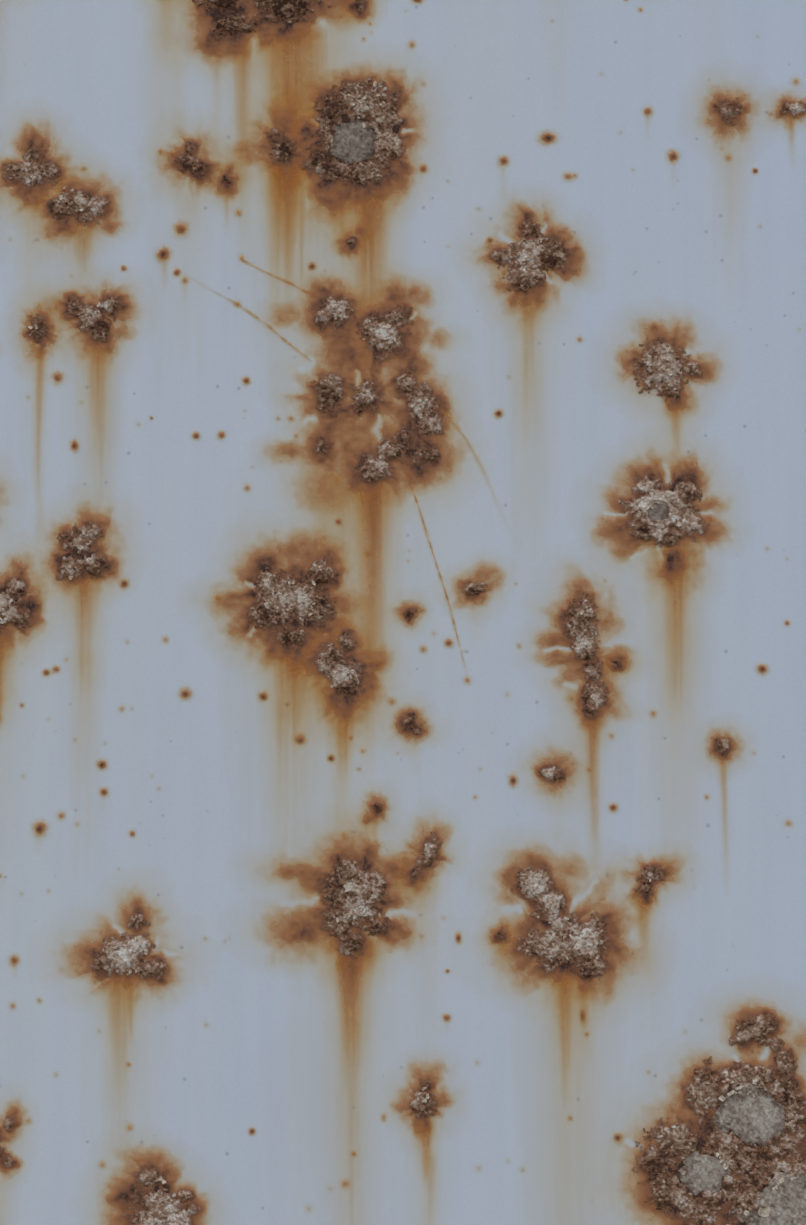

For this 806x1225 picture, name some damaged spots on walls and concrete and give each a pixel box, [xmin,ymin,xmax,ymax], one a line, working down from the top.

corrosion [192,0,370,57]
corrosion [0,129,117,236]
corrosion [248,74,426,253]
corrosion [485,206,583,305]
corrosion [282,263,451,571]
corrosion [51,513,127,586]
corrosion [600,461,721,582]
corrosion [222,539,385,720]
corrosion [540,580,626,738]
corrosion [279,828,446,1000]
corrosion [491,853,627,991]
corrosion [632,1007,806,1225]